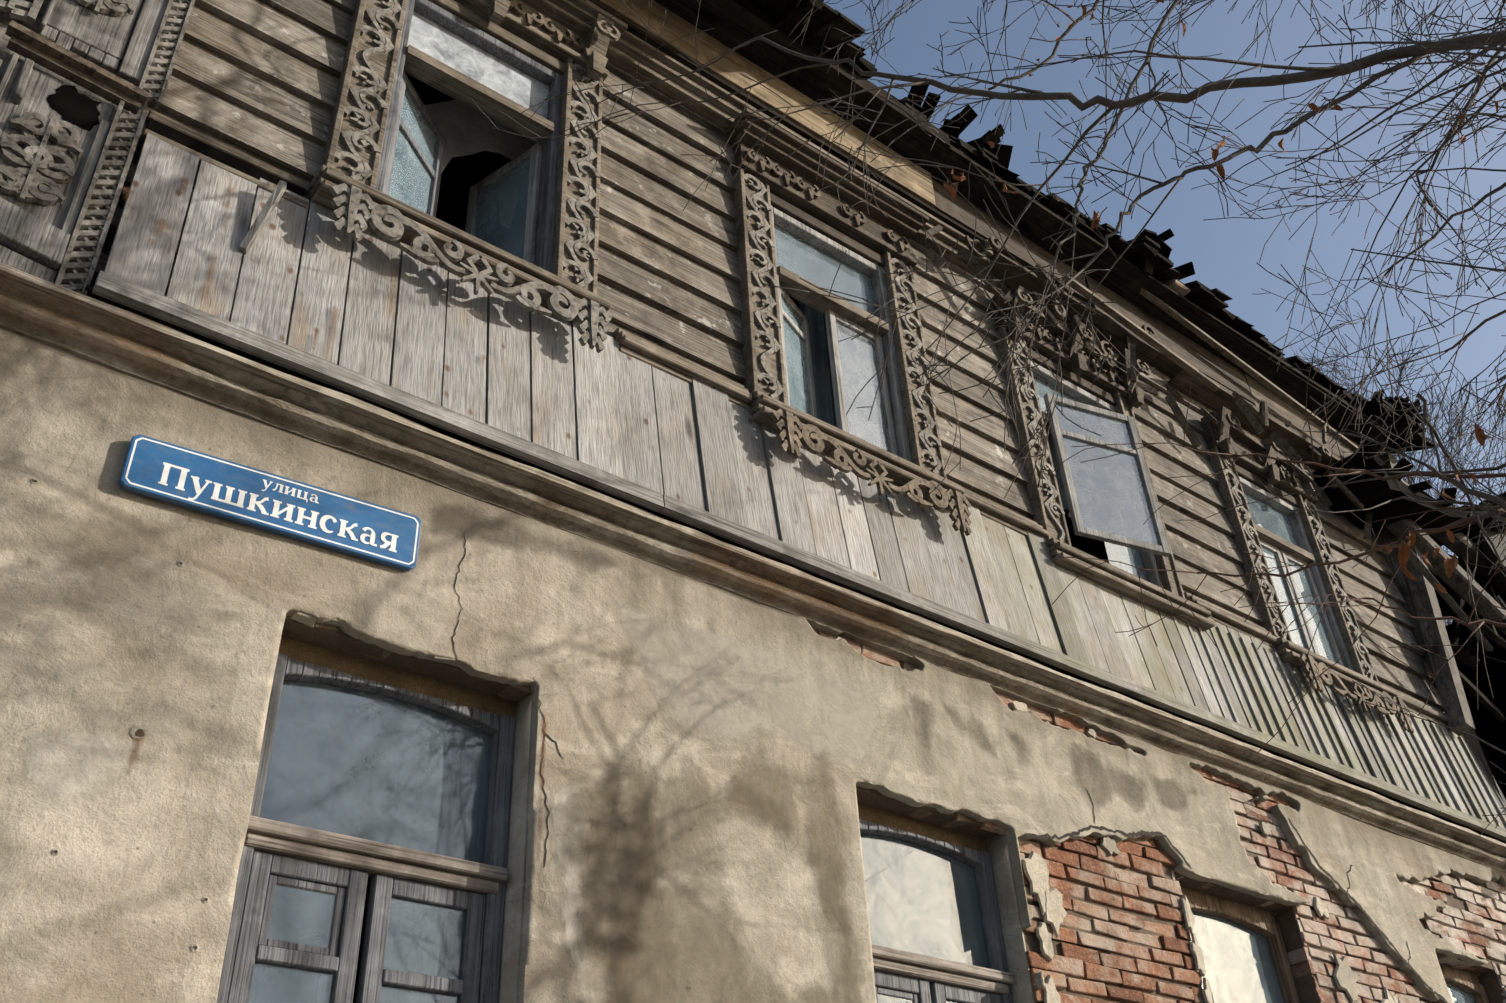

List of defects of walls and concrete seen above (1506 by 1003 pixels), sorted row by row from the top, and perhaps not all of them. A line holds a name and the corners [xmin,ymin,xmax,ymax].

crack [451,533,466,661]
crack [535,689,563,868]
spalling [994,691,1137,753]
damp [551,765,793,1003]
spalling [980,822,1214,1003]
spalling [1190,766,1437,1003]
spalling [1398,874,1506,1003]